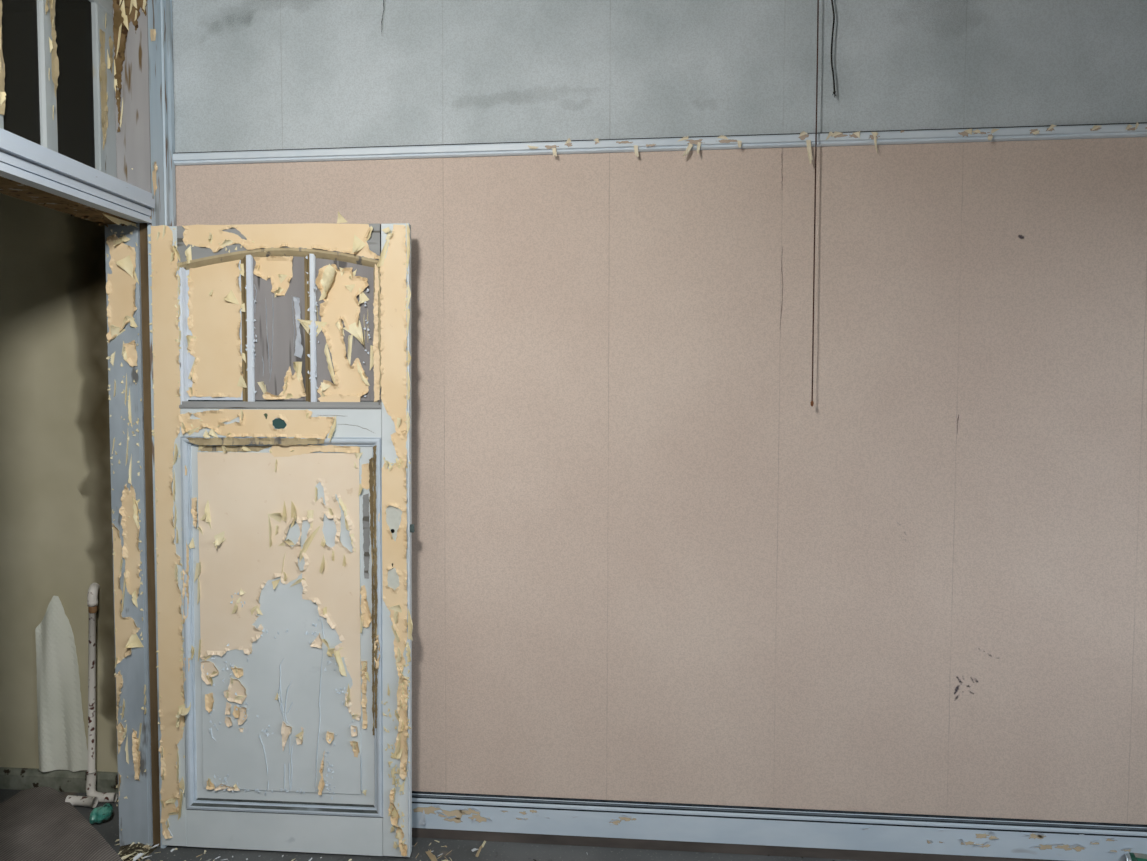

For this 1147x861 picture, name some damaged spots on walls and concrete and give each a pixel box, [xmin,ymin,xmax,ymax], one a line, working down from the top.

peeling [45,0,59,97]
peeling [99,0,156,149]
peeling [44,203,550,861]
peeling [1023,833,1133,853]